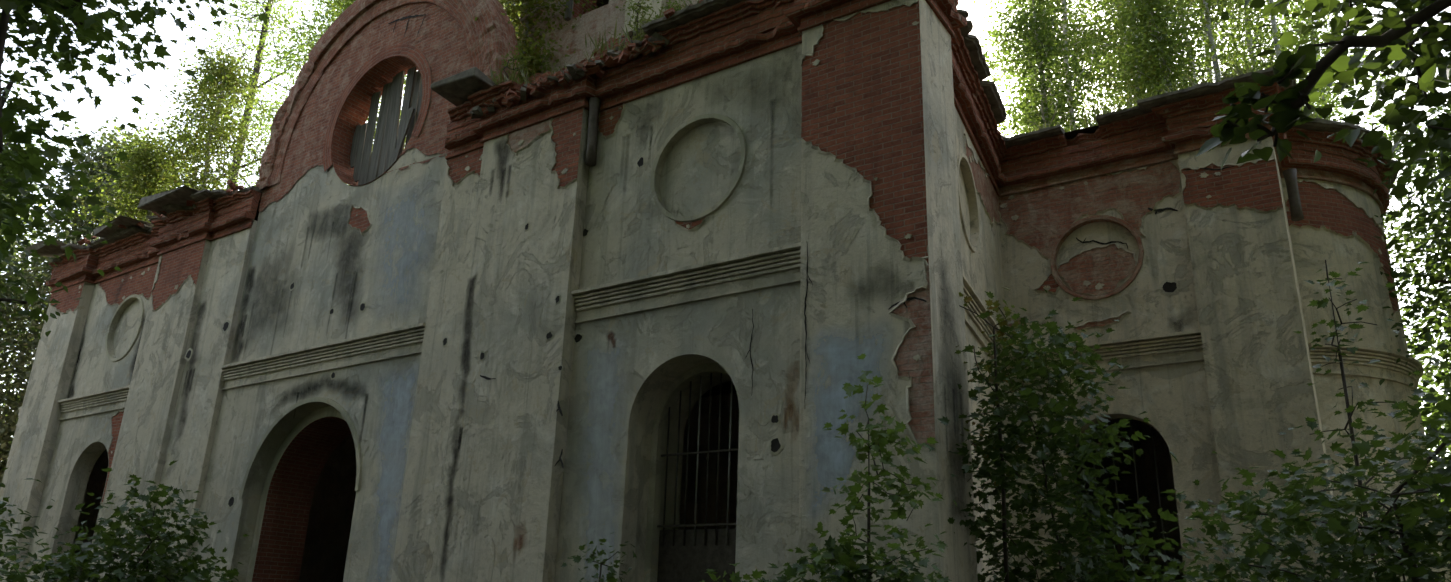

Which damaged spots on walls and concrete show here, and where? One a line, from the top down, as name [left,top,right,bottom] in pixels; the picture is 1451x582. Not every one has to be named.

peeling [446,148,483,186]
peeling [506,103,625,189]
peeling [347,204,372,236]
peeling [801,0,935,447]
peeling [964,133,1400,319]
peeling [48,240,205,315]